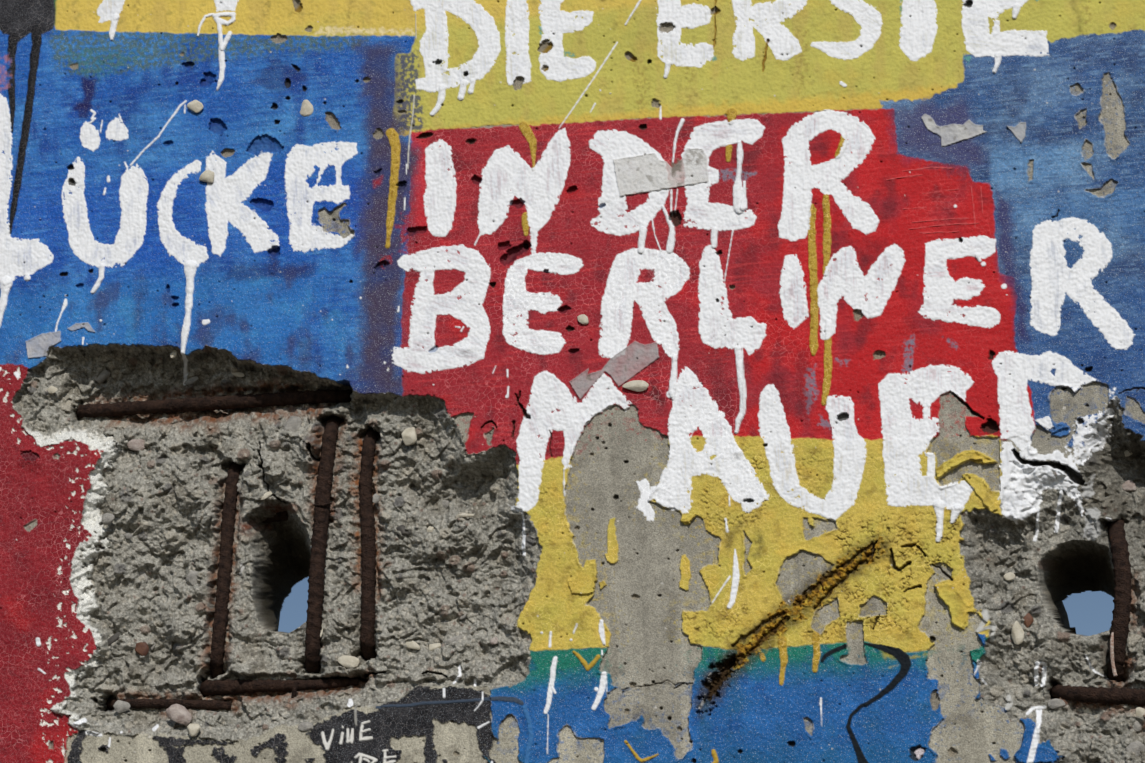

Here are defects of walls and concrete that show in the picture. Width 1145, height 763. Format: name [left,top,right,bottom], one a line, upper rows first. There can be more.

peeling [1076,72,1130,198]
crack [1013,450,1085,486]
rust [89,380,385,675]
rust [110,668,377,719]
spalling [0,344,543,763]
peeling [549,405,722,763]
peeling [777,518,837,607]
peeling [811,596,888,666]
spalling [910,382,1145,763]
rust [1057,697,1145,734]
rust [1109,654,1138,688]
rust [1129,572,1139,631]